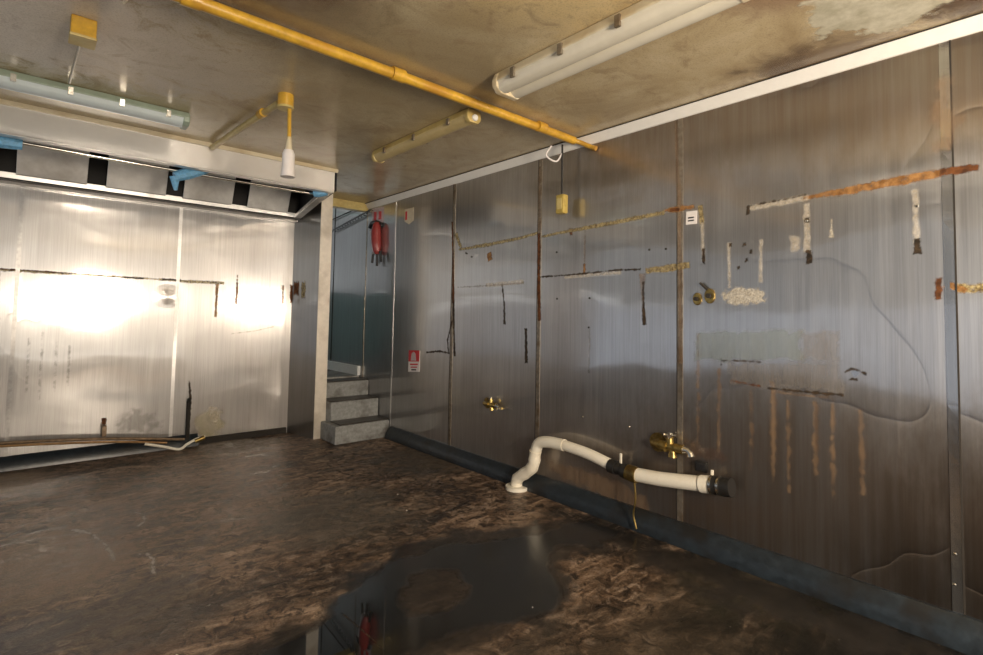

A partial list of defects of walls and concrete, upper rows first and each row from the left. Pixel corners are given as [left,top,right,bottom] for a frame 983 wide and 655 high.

peeling [798,0,953,40]
corrosion [746,164,979,215]
corrosion [426,140,705,356]
corrosion [934,277,983,300]
leakage [231,508,953,655]